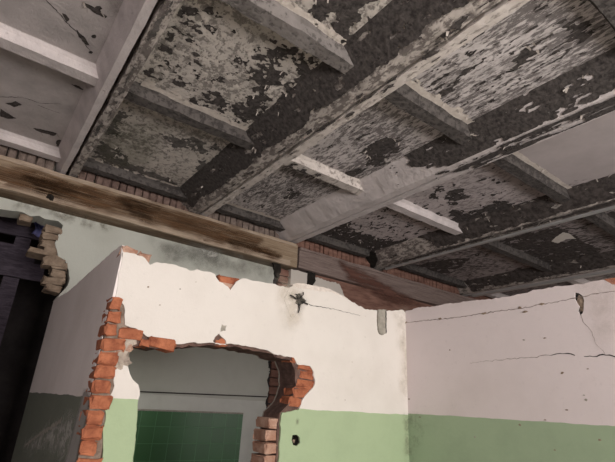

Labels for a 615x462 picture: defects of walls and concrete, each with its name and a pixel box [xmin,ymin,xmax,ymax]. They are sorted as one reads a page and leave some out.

peeling [91,0,469,221]
peeling [321,15,615,292]
spalling [290,292,308,313]
crack [405,291,614,323]
crack [473,316,615,363]
peeling [65,297,177,462]
flaking render [267,355,314,407]
flaking render [250,416,278,462]